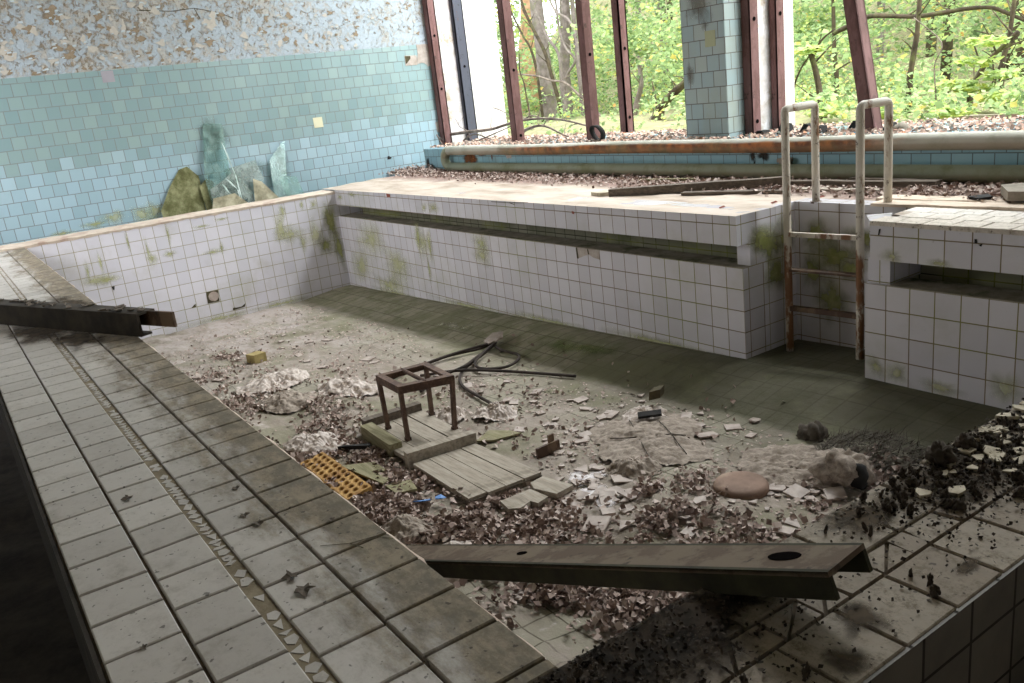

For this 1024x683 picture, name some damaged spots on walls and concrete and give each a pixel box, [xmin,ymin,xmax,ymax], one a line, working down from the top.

peeling [0,0,226,76]
peeling [240,0,390,57]
flaking render [403,4,431,67]
peeling [192,290,220,308]